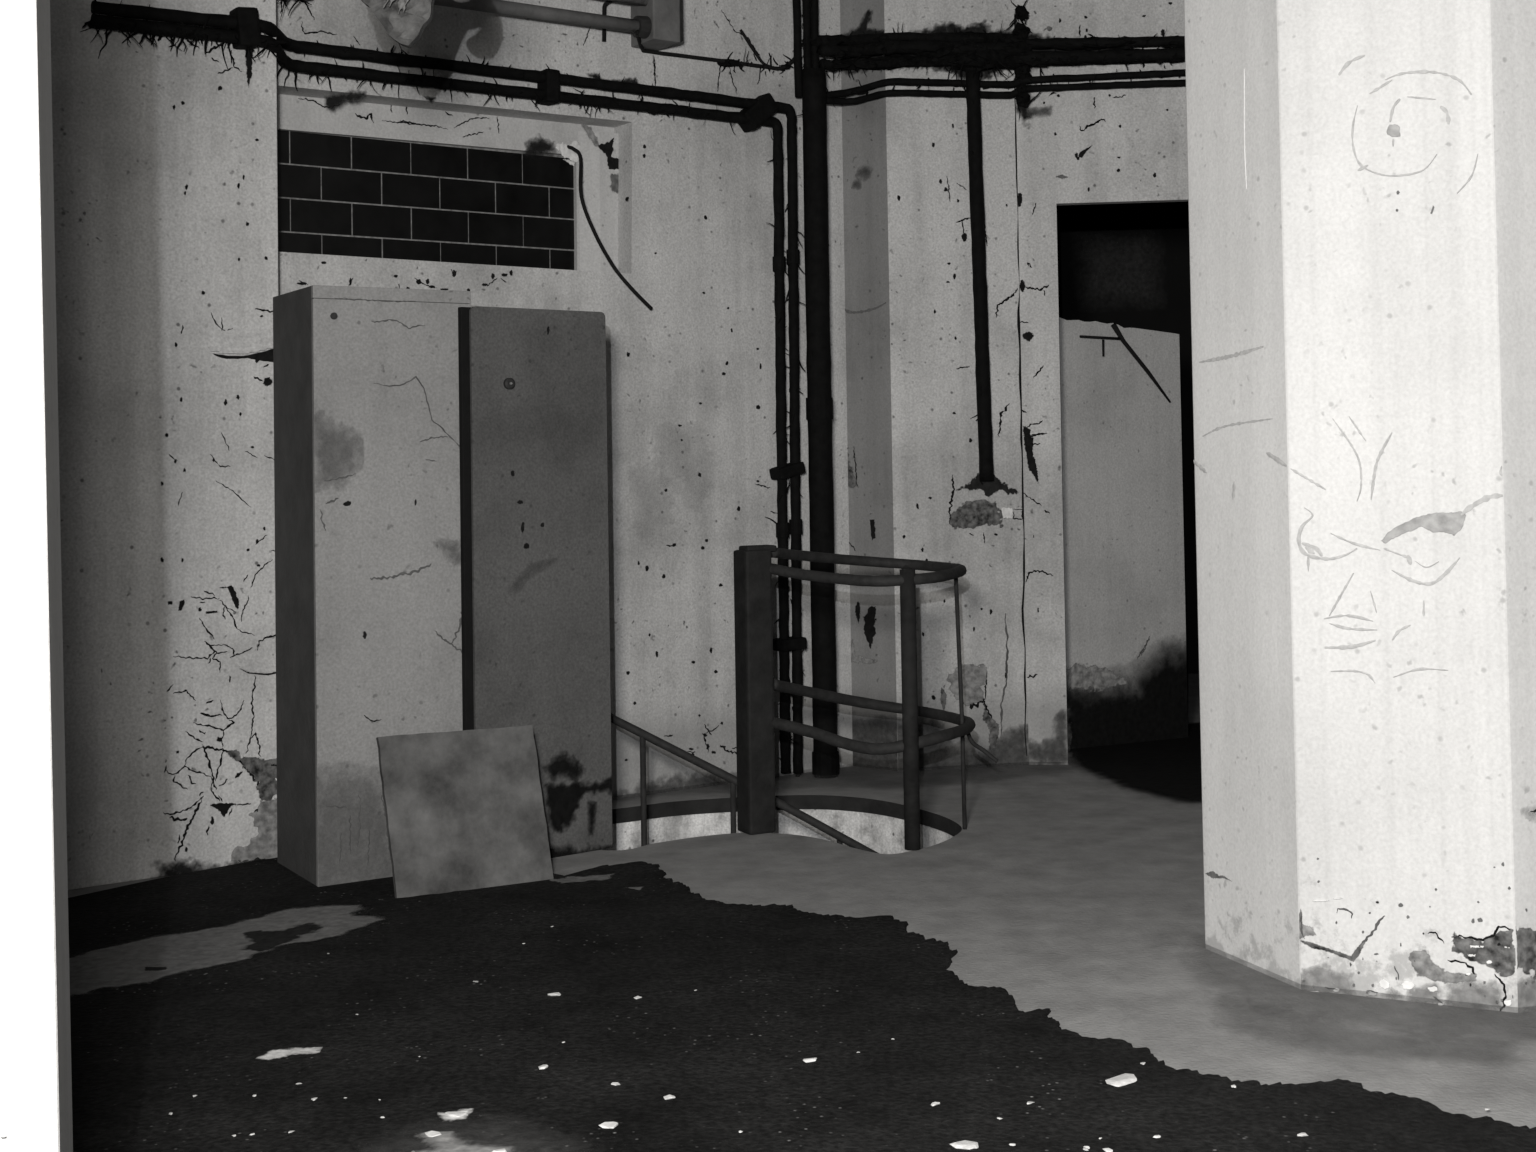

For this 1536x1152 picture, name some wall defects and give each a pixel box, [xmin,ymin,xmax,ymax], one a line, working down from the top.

flaking render [916,475,1023,543]
crack [163,634,276,861]
flaking render [206,737,277,862]
flaking render [1299,880,1536,1011]